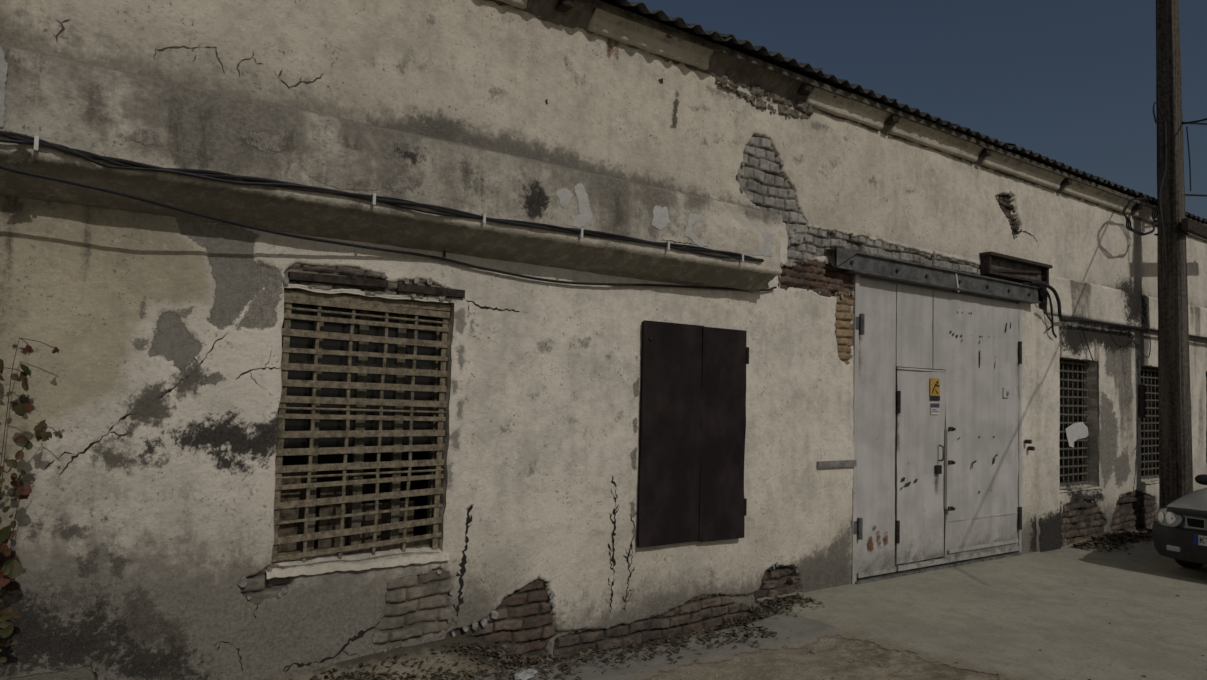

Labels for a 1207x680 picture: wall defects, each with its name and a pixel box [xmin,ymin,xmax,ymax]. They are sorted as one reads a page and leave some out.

crack [154,45,324,88]
damp [373,114,710,198]
damp [521,180,549,218]
spalling [736,135,1041,365]
peeling [133,296,202,370]
crack [235,348,283,390]
peeling [176,218,474,449]
damp [1057,278,1150,359]
crack [44,413,135,476]
damp [93,357,286,476]
crack [452,504,474,625]
spalling [372,562,800,660]